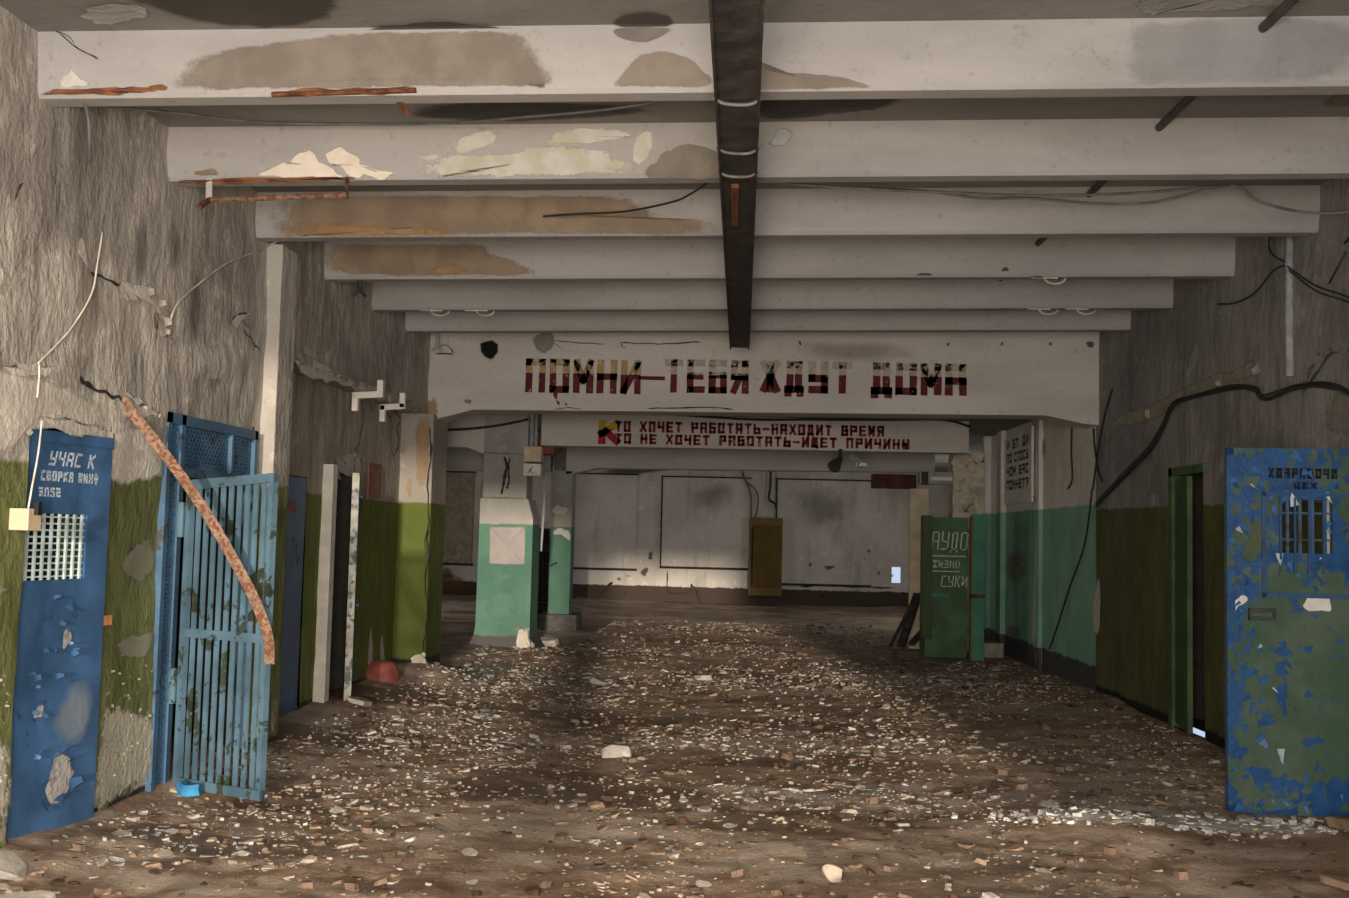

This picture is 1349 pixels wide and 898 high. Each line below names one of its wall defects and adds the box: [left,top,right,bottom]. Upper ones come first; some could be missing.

water stain [135,0,333,27]
water stain [182,22,549,90]
water stain [613,12,711,87]
corrosion [44,84,167,95]
corrosion [275,86,410,96]
corrosion [179,177,355,185]
peeling [258,147,393,180]
water stain [417,103,719,179]
peeling [42,595,80,658]
peeling [0,633,153,813]
peeling [0,740,11,826]